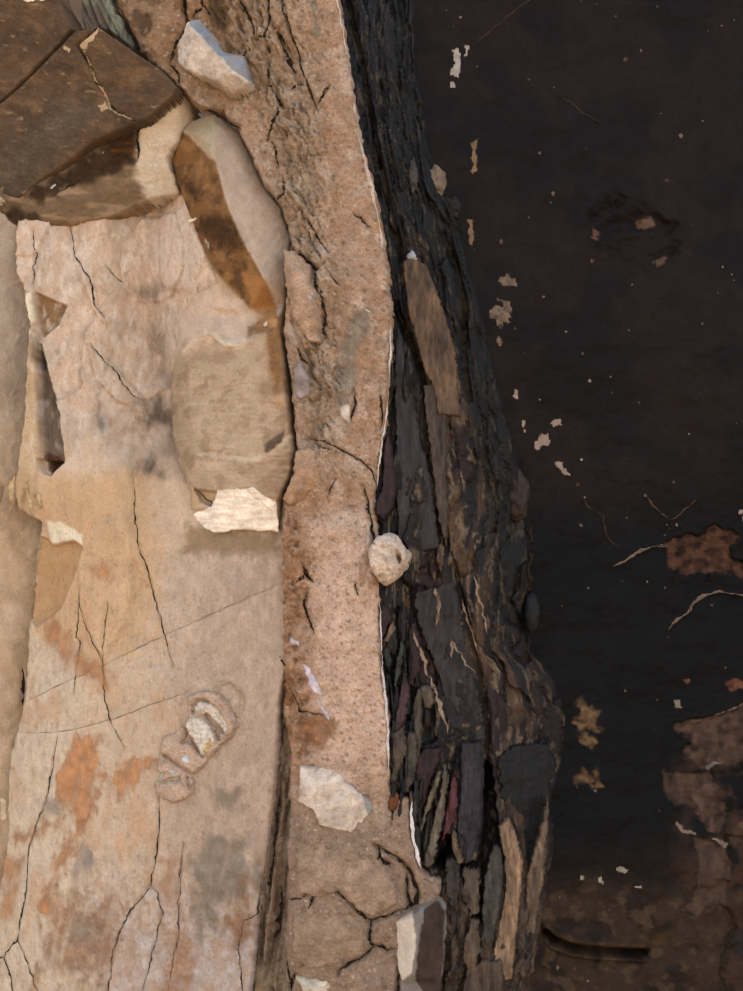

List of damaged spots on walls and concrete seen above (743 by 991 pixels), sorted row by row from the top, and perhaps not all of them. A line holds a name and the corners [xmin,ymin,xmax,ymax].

peeling [664,523,743,579]
crack [0,480,314,991]
peeling [725,678,743,691]
peeling [663,703,743,917]
crack [337,845,420,974]